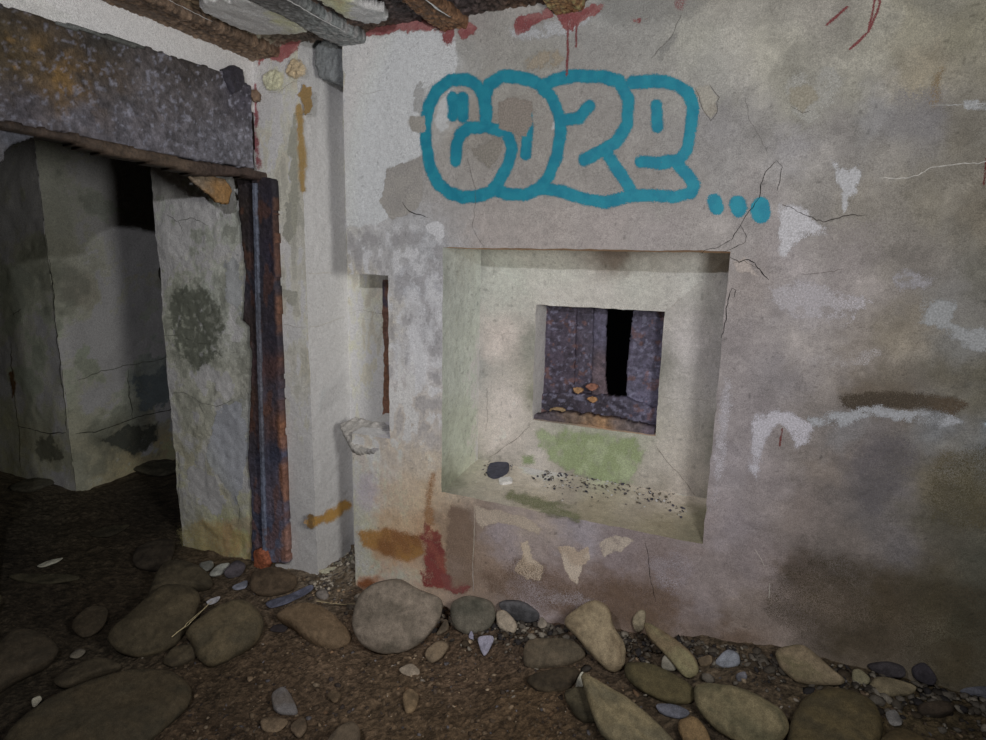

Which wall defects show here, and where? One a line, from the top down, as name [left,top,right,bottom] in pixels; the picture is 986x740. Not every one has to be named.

crack [702,100,862,280]
crack [11,260,231,466]
leakage [167,276,226,373]
corrosion [382,280,390,415]
corrosion [573,383,599,403]
corrosion [304,499,352,530]
corrosion [356,472,438,566]
spalling [558,535,633,584]